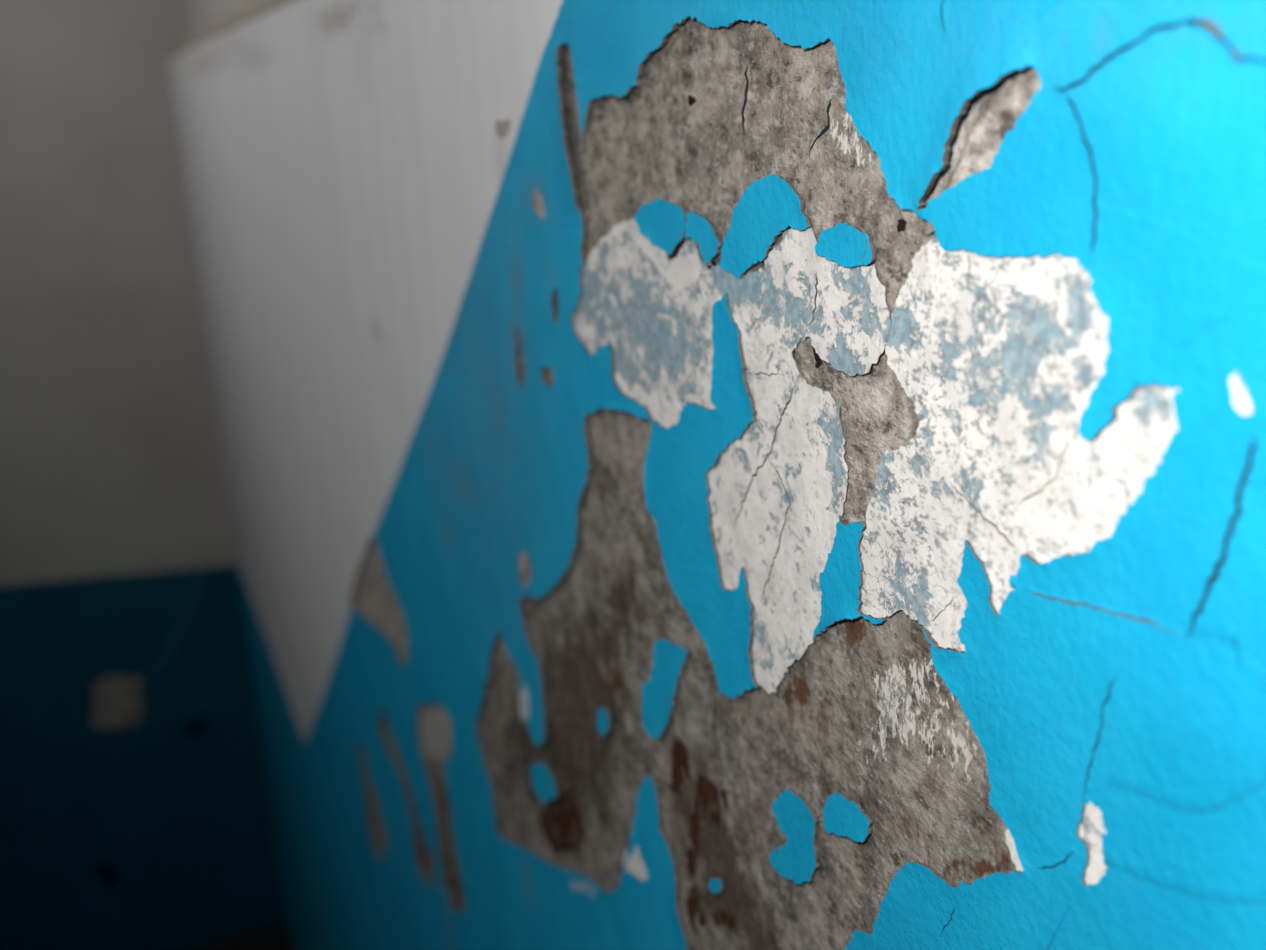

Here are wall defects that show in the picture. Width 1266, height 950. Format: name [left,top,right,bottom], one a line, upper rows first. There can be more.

crack [1052,15,1266,253]
peeling [352,538,409,664]
spalling [478,17,1180,950]
crack [1009,304,1266,683]
peeling [360,742,388,859]
peeling [379,703,466,911]
crack [939,880,963,937]
crack [1035,669,1266,950]